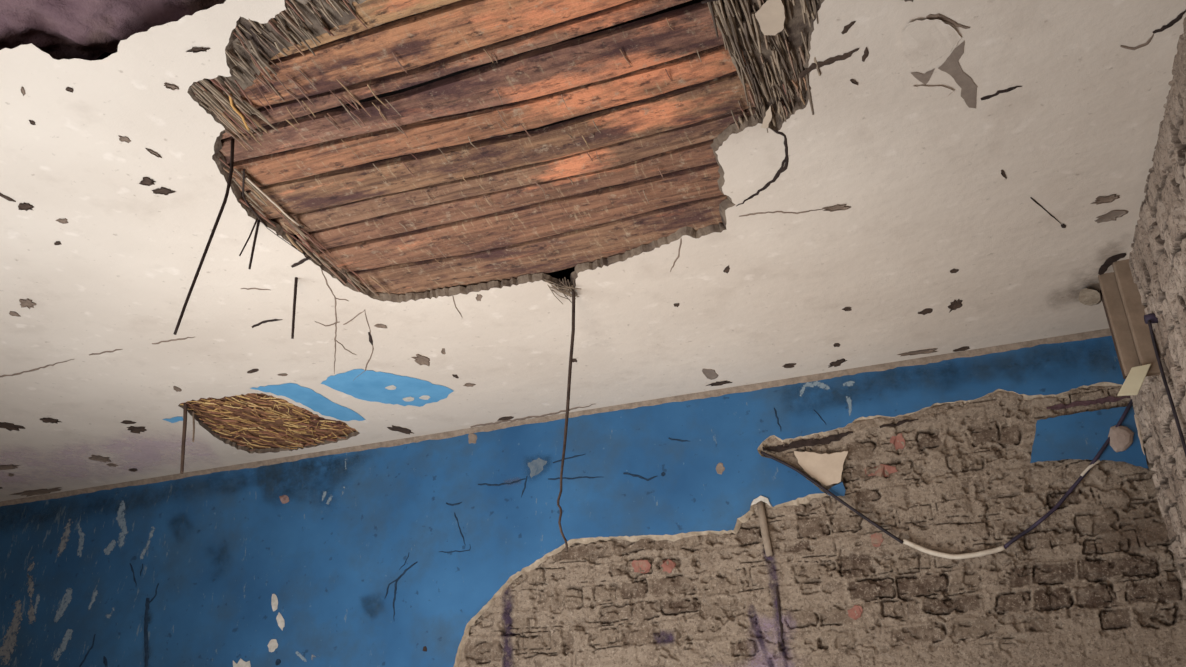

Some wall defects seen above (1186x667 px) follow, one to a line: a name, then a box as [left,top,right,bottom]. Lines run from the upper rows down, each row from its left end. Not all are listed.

spalling [0,0,226,61]
crack [1120,10,1186,50]
spalling [0,193,34,211]
spalling [139,177,175,195]
spalling [164,0,824,304]
crack [736,129,823,217]
spalling [822,204,851,212]
spalling [9,299,37,317]
crack [291,257,374,377]
crack [384,454,657,619]
spalling [454,382,1186,667]
spalling [267,594,285,665]